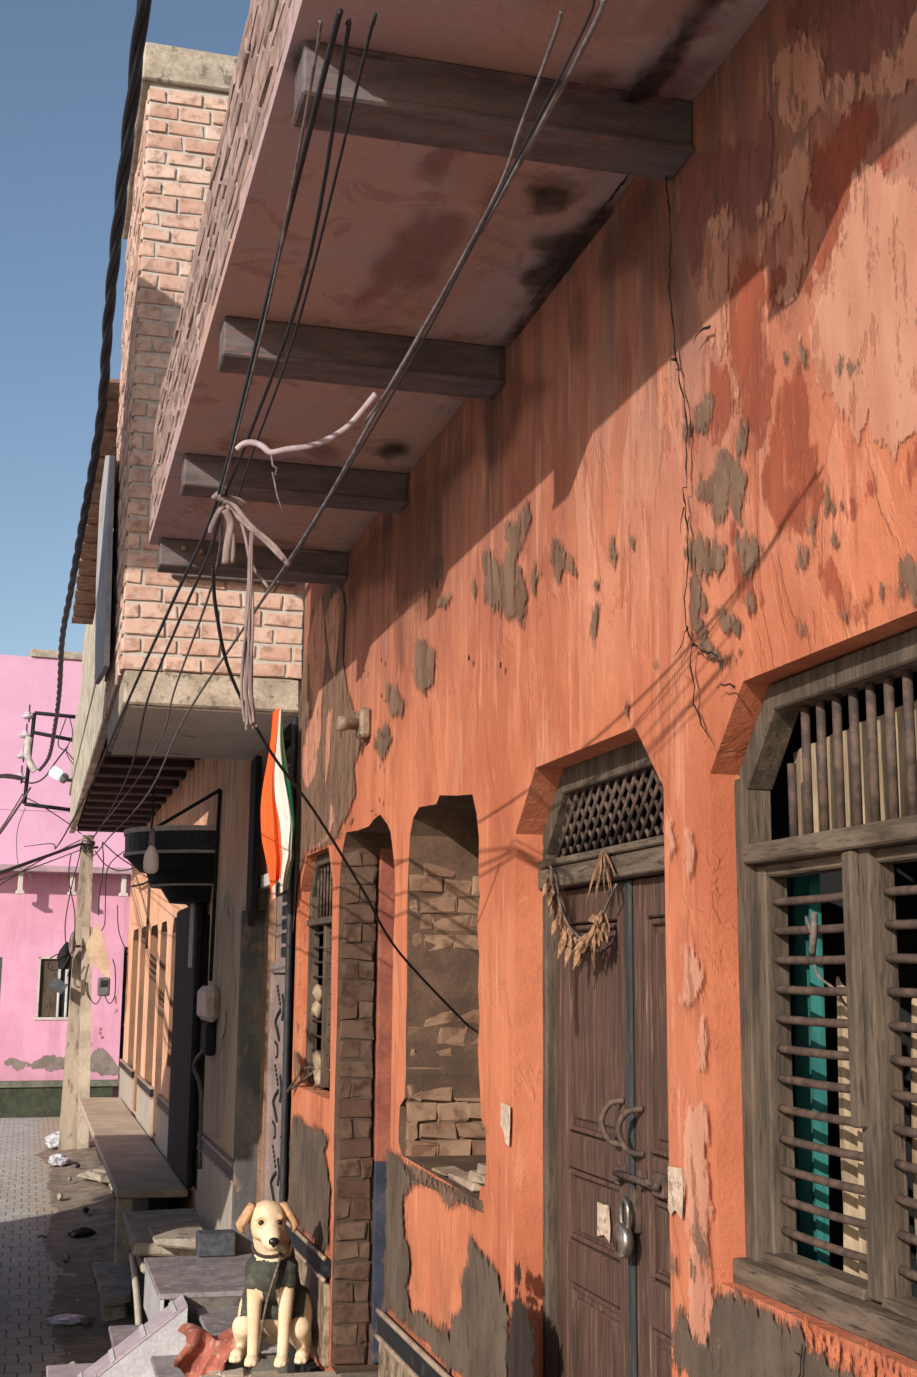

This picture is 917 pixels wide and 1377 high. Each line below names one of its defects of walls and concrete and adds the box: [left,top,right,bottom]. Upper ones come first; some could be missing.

crack [599,175,628,212]
peeling [680,7,917,668]
crack [665,175,735,743]
flaking render [471,496,576,633]
flaking render [588,535,635,647]
flaking render [292,584,434,933]
peeling [663,817,694,876]
flaking render [4,1055,65,1072]
flaking render [90,1028,120,1076]
peeling [679,942,707,1073]
flaking render [383,1146,510,1377]
flaking render [668,1101,859,1377]